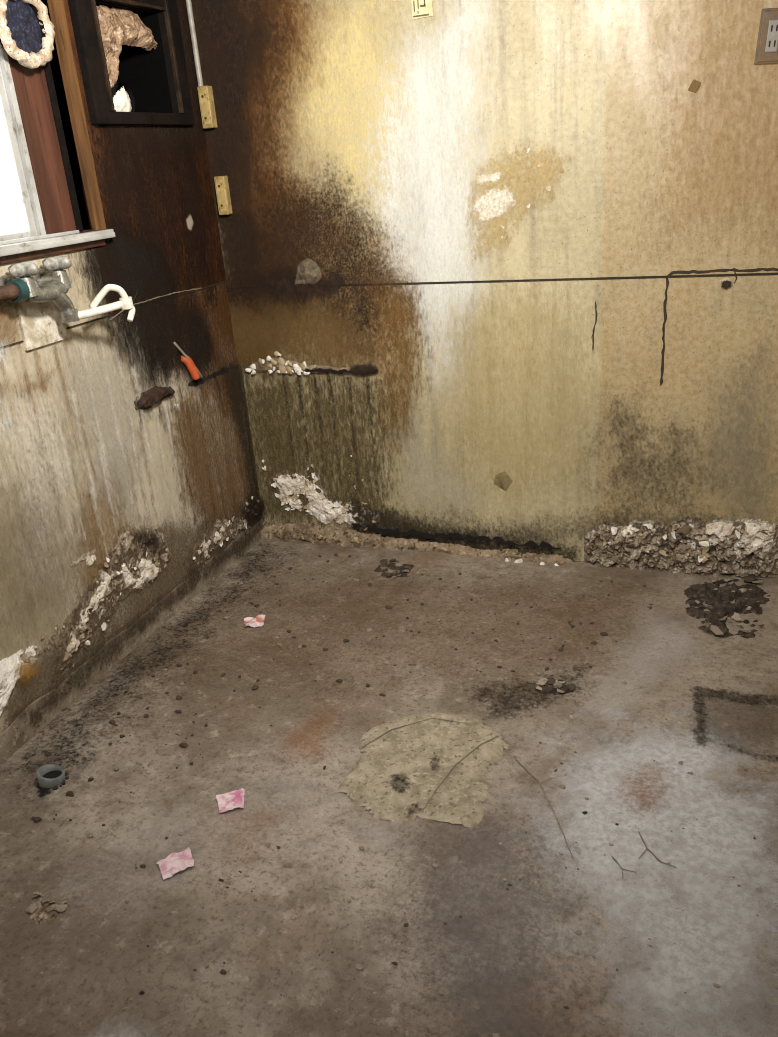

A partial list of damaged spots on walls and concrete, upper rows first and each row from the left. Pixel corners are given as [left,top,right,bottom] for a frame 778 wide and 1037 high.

water stain [284,0,483,349]
peeling [470,148,570,256]
water stain [15,546,283,773]
water stain [2,294,726,727]
flaking render [584,516,778,578]
spalling [393,774,410,792]
water stain [412,686,778,1037]